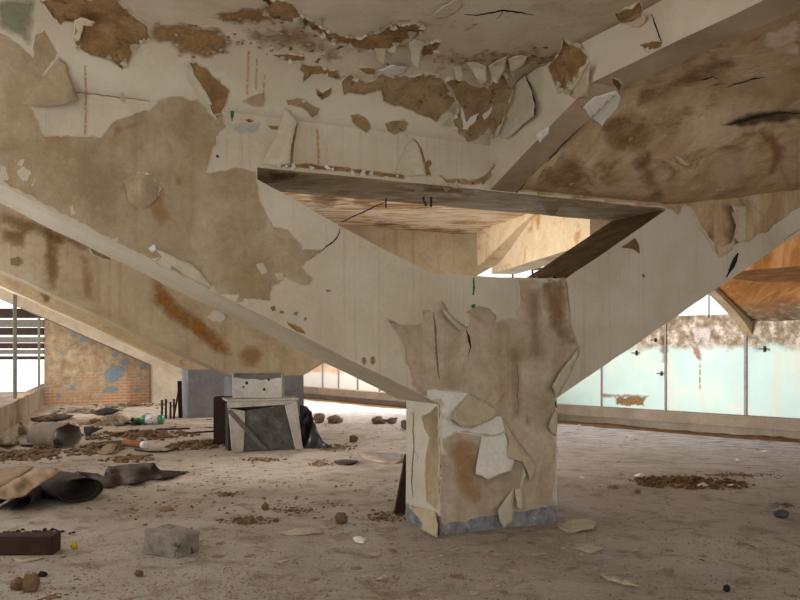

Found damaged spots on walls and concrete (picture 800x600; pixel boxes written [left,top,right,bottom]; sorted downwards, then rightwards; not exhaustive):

crack [464,9,532,18]
leakage [762,22,800,55]
crack [726,112,800,125]
leakage [733,111,800,126]
peeling [0,0,623,335]
leakage [5,219,79,278]
crack [312,202,385,257]
peeling [519,189,800,257]
crack [726,253,739,278]
rust [156,286,225,350]
leakage [692,327,711,343]
peeling [385,276,580,537]